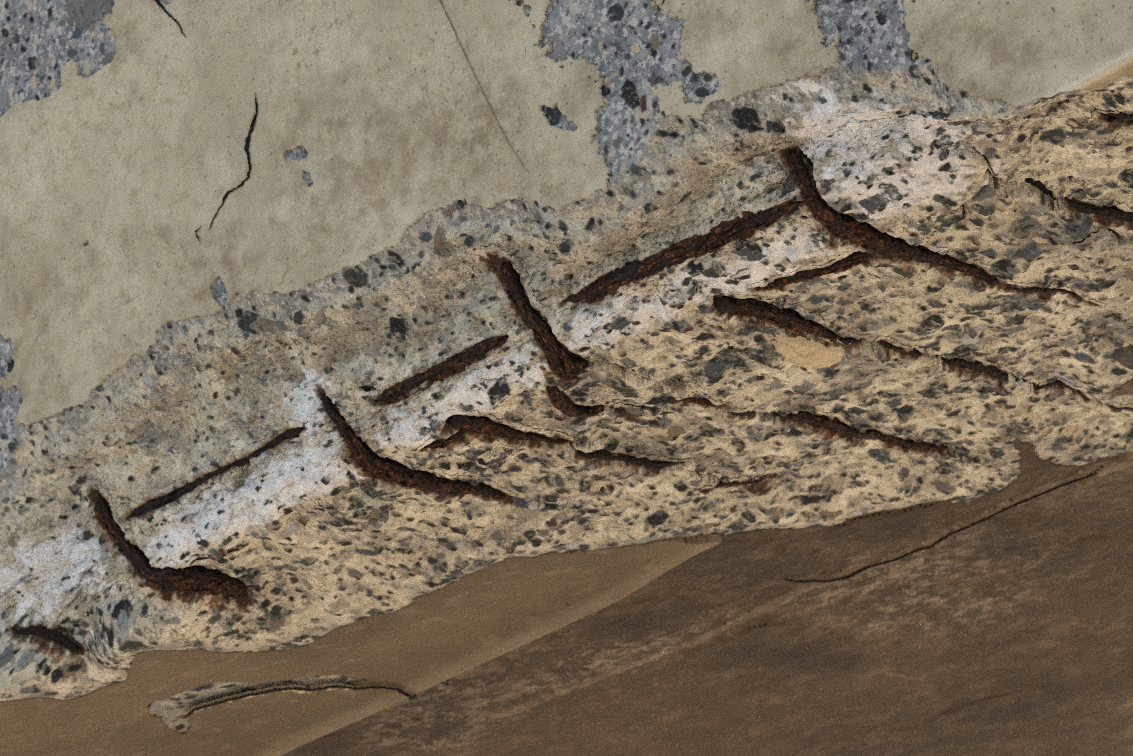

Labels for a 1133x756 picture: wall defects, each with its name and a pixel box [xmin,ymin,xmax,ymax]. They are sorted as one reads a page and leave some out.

crack [195,92,258,244]
spalling [0,0,800,598]
water stain [553,214,829,361]
spalling [756,251,868,290]
spalling [787,149,999,285]
rust [1056,192,1133,248]
rust [1080,109,1133,144]
water stain [131,323,545,564]
rust [78,141,1105,628]
water stain [0,494,147,671]
crack [784,472,1097,583]
crack [183,682,448,719]